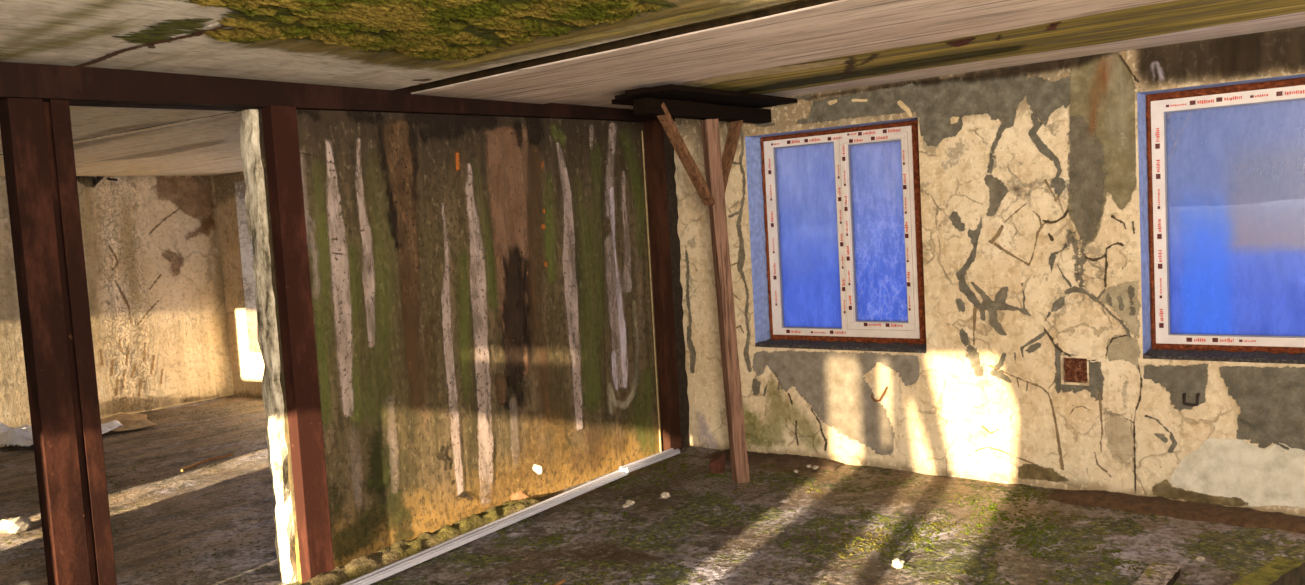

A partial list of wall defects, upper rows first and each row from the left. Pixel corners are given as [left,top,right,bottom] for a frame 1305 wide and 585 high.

water stain [409,128,419,198]
crack [108,246,162,325]
crack [149,208,180,235]
water stain [325,111,399,422]
water stain [441,117,583,504]
water stain [605,122,632,390]
crack [988,177,1069,266]
spalling [789,52,1305,453]
crack [1085,215,1135,287]
spalling [1152,479,1248,507]